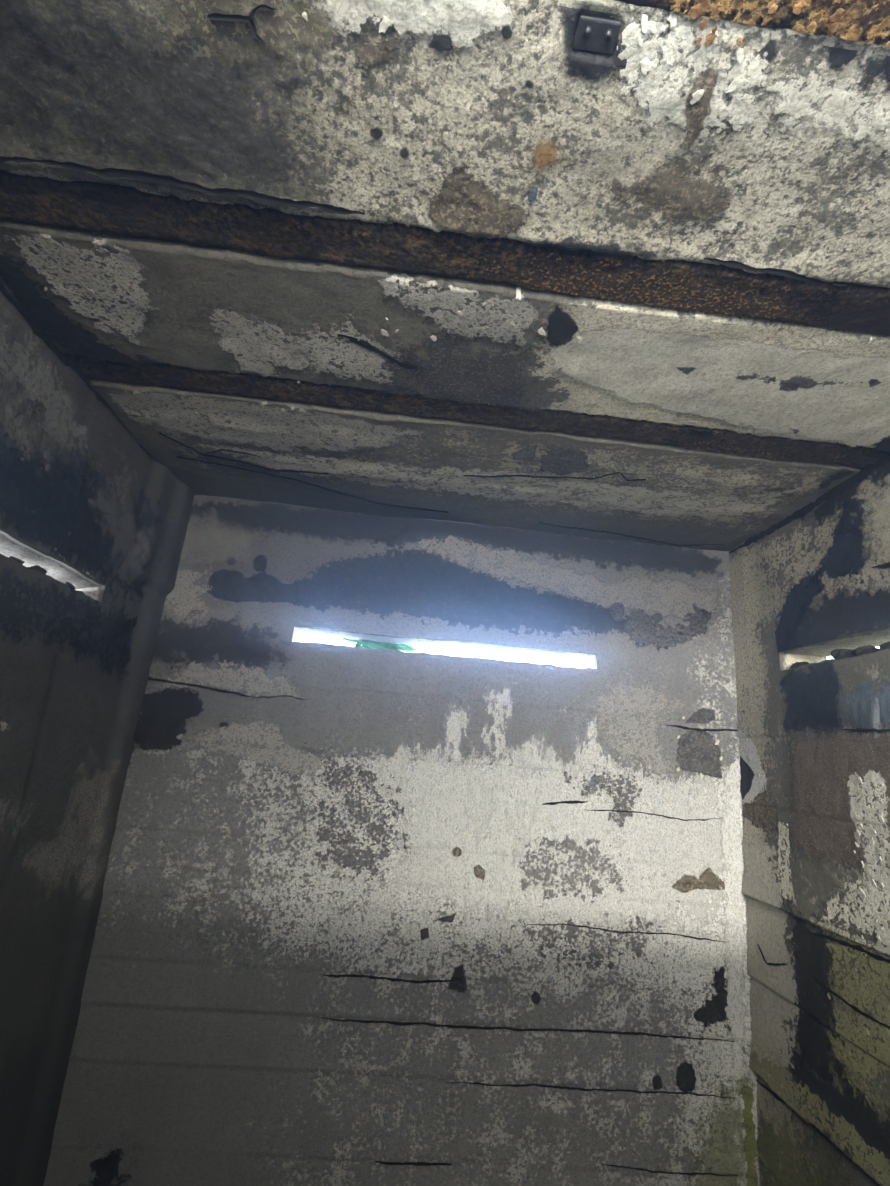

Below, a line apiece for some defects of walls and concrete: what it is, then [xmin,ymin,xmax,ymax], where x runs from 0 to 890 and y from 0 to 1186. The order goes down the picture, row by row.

corrosion [812,0,890,41]
peeling [608,0,890,228]
peeling [428,166,537,239]
peeling [197,308,403,385]
peeling [378,272,582,350]
peeling [104,390,805,523]
water stain [128,687,205,767]
spalling [676,703,723,779]
peeling [275,742,412,885]
peeling [740,681,890,967]
peeling [511,834,665,971]
peeling [672,868,725,893]